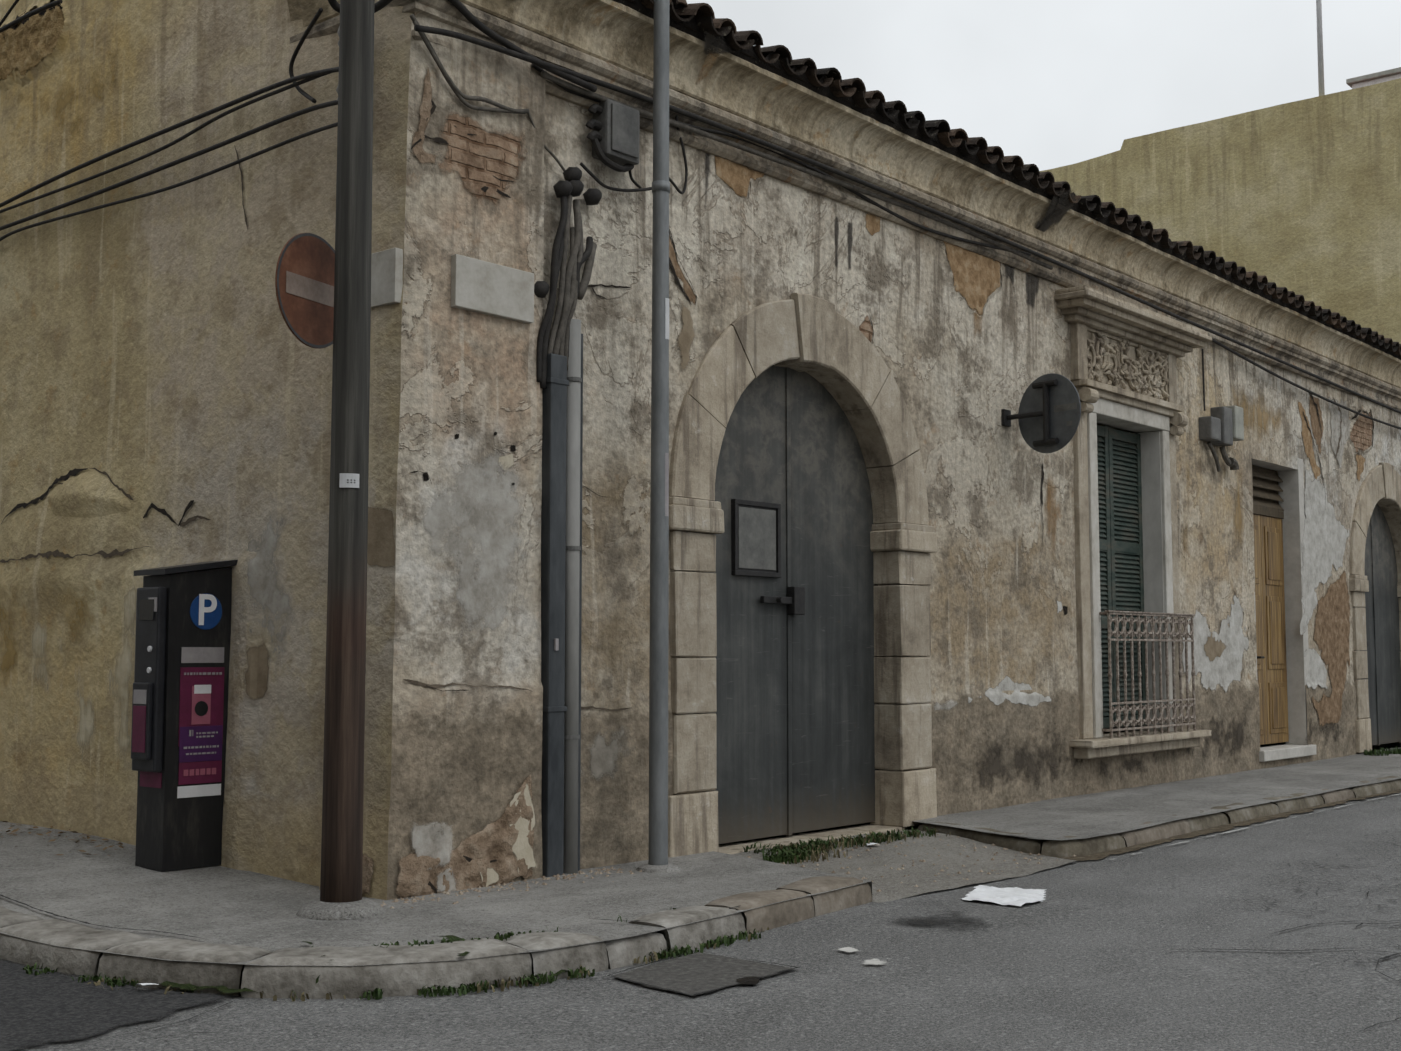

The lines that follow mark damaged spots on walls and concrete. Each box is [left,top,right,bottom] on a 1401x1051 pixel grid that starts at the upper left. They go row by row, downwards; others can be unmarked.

flaking render [0,0,71,91]
spalling [411,68,525,204]
peeling [710,154,768,204]
peeling [939,240,1003,328]
crack [0,468,211,563]
peeling [1298,394,1374,726]
peeling [1181,587,1249,695]
peeling [935,676,1051,710]
flaking render [396,774,536,898]
crack [1272,920,1400,982]